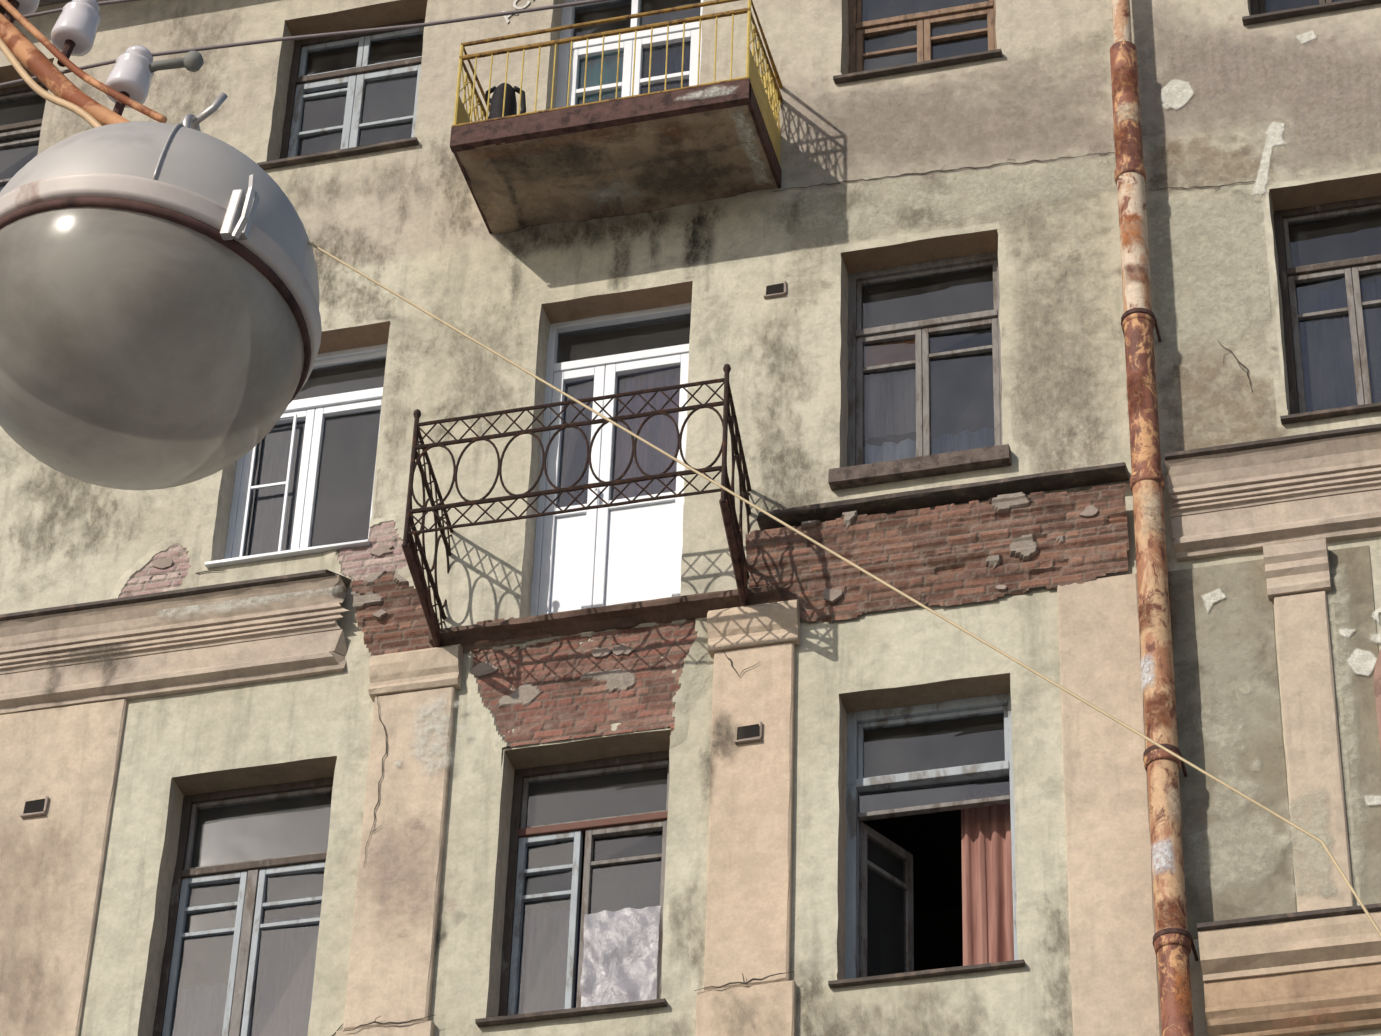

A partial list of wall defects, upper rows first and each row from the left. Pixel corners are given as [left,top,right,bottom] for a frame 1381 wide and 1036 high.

rust [1125,264,1147,282]
rust [1127,375,1145,413]
crack [1218,341,1253,393]
damp [29,473,116,548]
spalling [110,534,202,599]
spalling [163,513,434,656]
spalling [745,462,1161,623]
rust [1138,602,1150,631]
spalling [416,617,708,771]
crack [363,696,387,868]
crack [694,971,794,991]
crack [332,1015,434,1036]